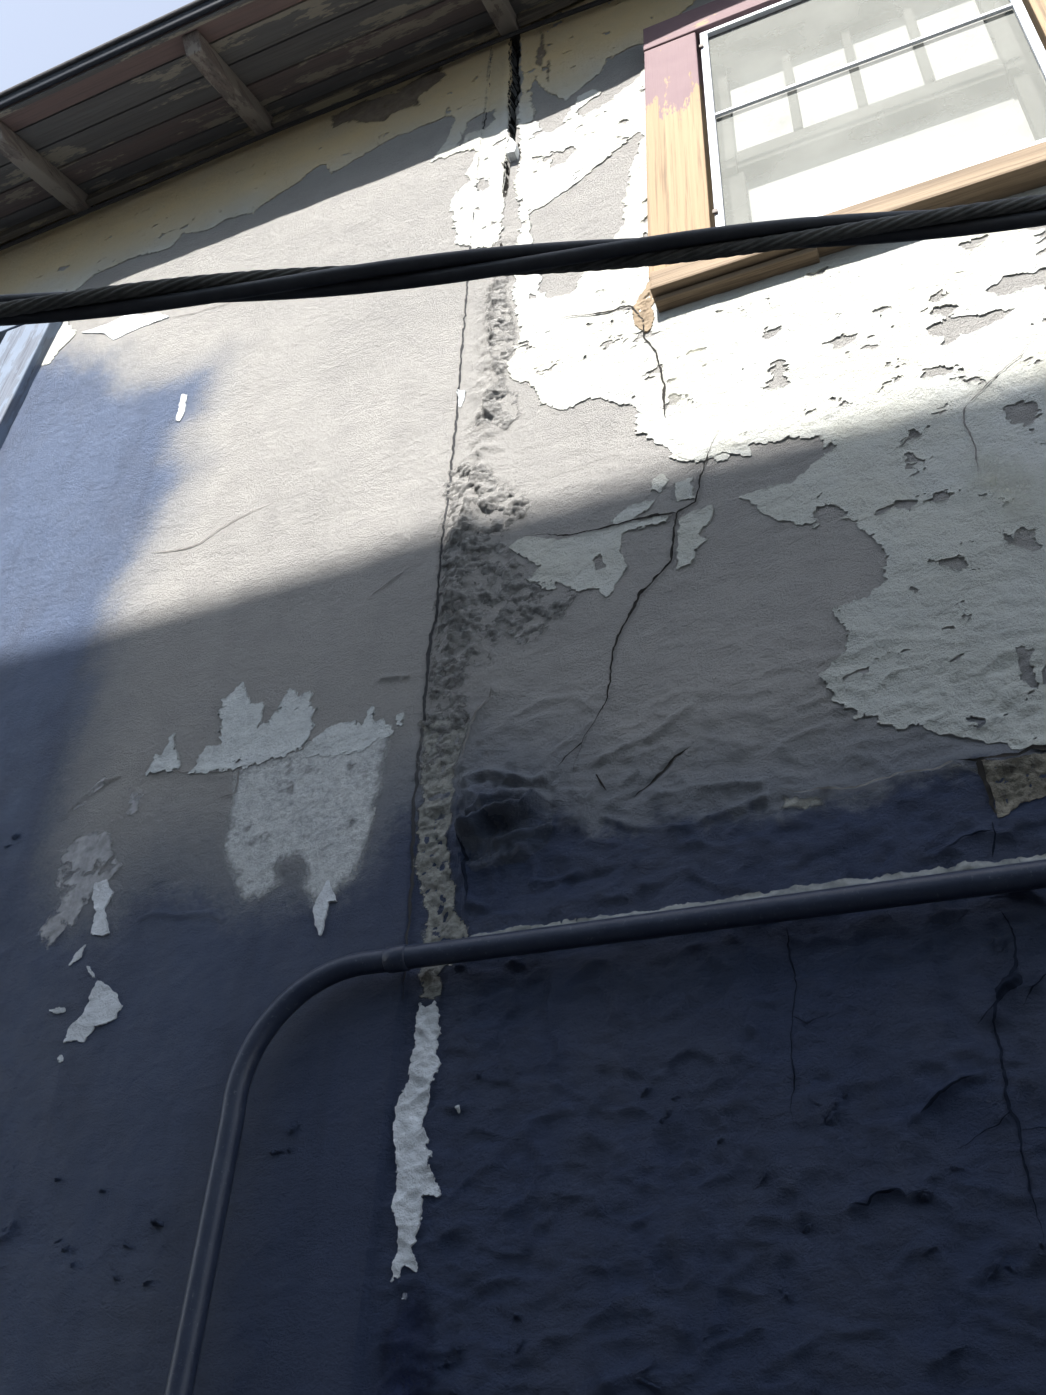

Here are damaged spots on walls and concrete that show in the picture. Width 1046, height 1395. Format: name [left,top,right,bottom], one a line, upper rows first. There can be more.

spalling [42,313,169,366]
peeling [0,0,695,295]
crack [558,305,666,418]
peeling [999,186,1046,200]
crack [403,38,521,996]
peeling [146,228,1046,943]
crack [525,435,717,768]
peeling [39,831,123,1063]
spalling [390,964,452,1300]
crack [786,927,822,1124]
crack [850,1188,927,1206]
crack [920,913,1046,1240]